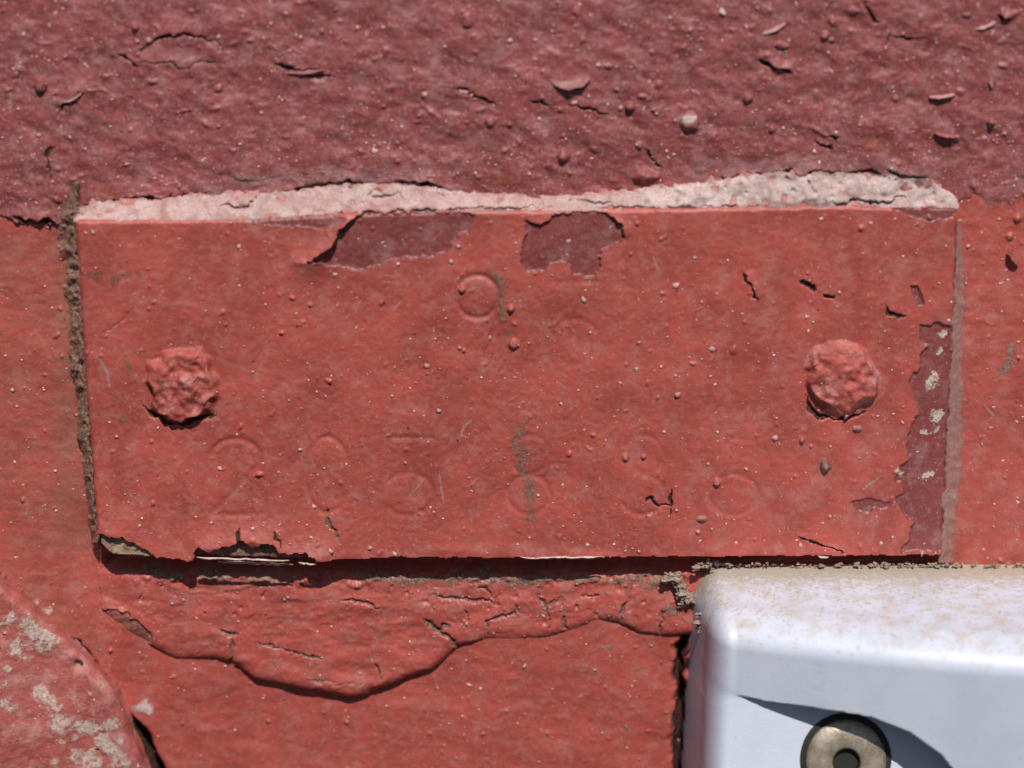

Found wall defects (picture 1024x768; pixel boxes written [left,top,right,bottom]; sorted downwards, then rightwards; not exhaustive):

crack [864,2,918,45]
crack [118,32,225,70]
crack [274,62,336,80]
crack [758,59,792,75]
crack [451,87,495,104]
crack [530,100,610,115]
peeling [892,206,955,222]
peeling [246,210,475,271]
peeling [520,211,625,278]
peeling [850,322,953,555]
crack [338,598,382,609]
crack [422,583,632,647]